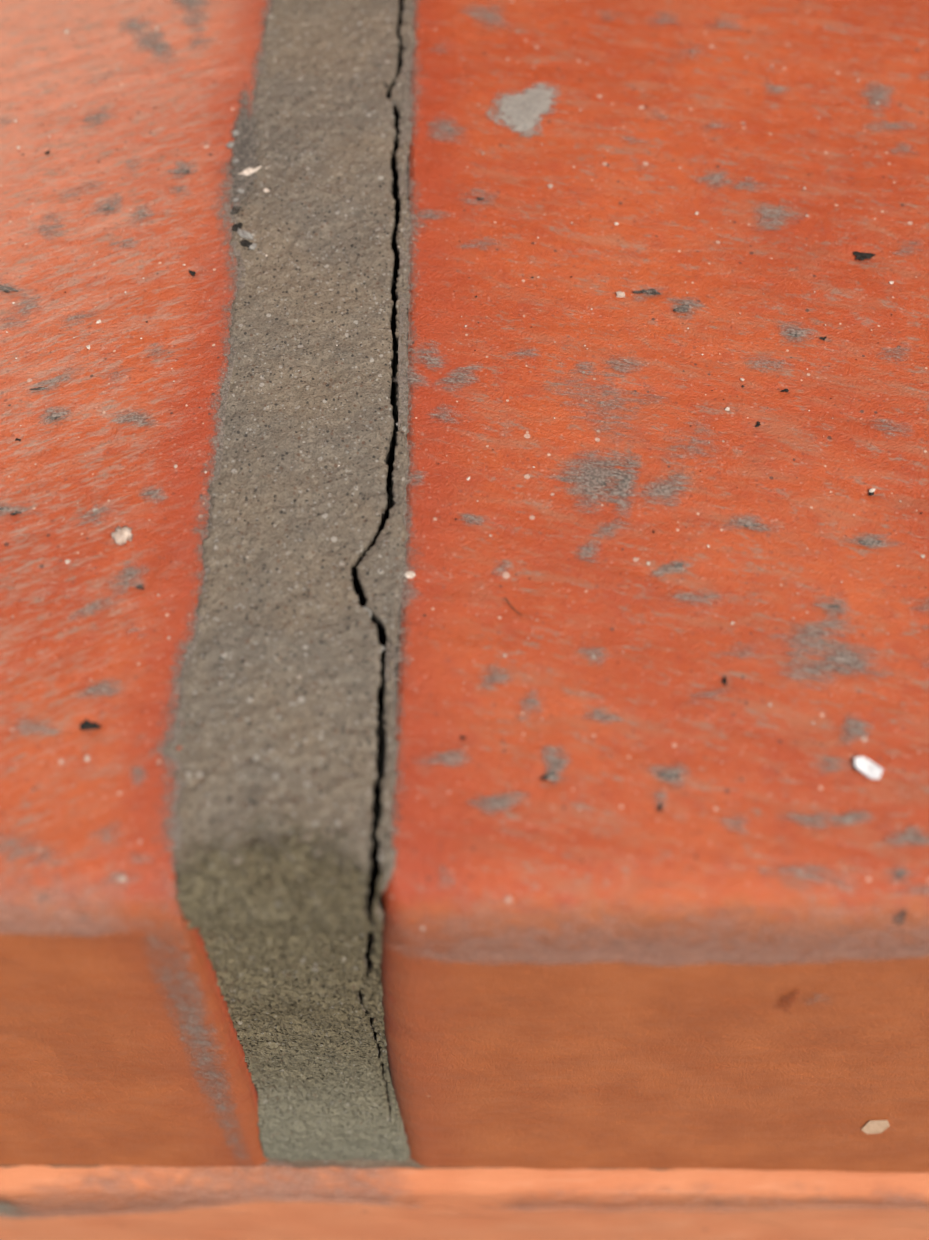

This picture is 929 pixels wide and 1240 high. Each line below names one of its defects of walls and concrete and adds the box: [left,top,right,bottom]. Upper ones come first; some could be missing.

crack [351,0,404,968]